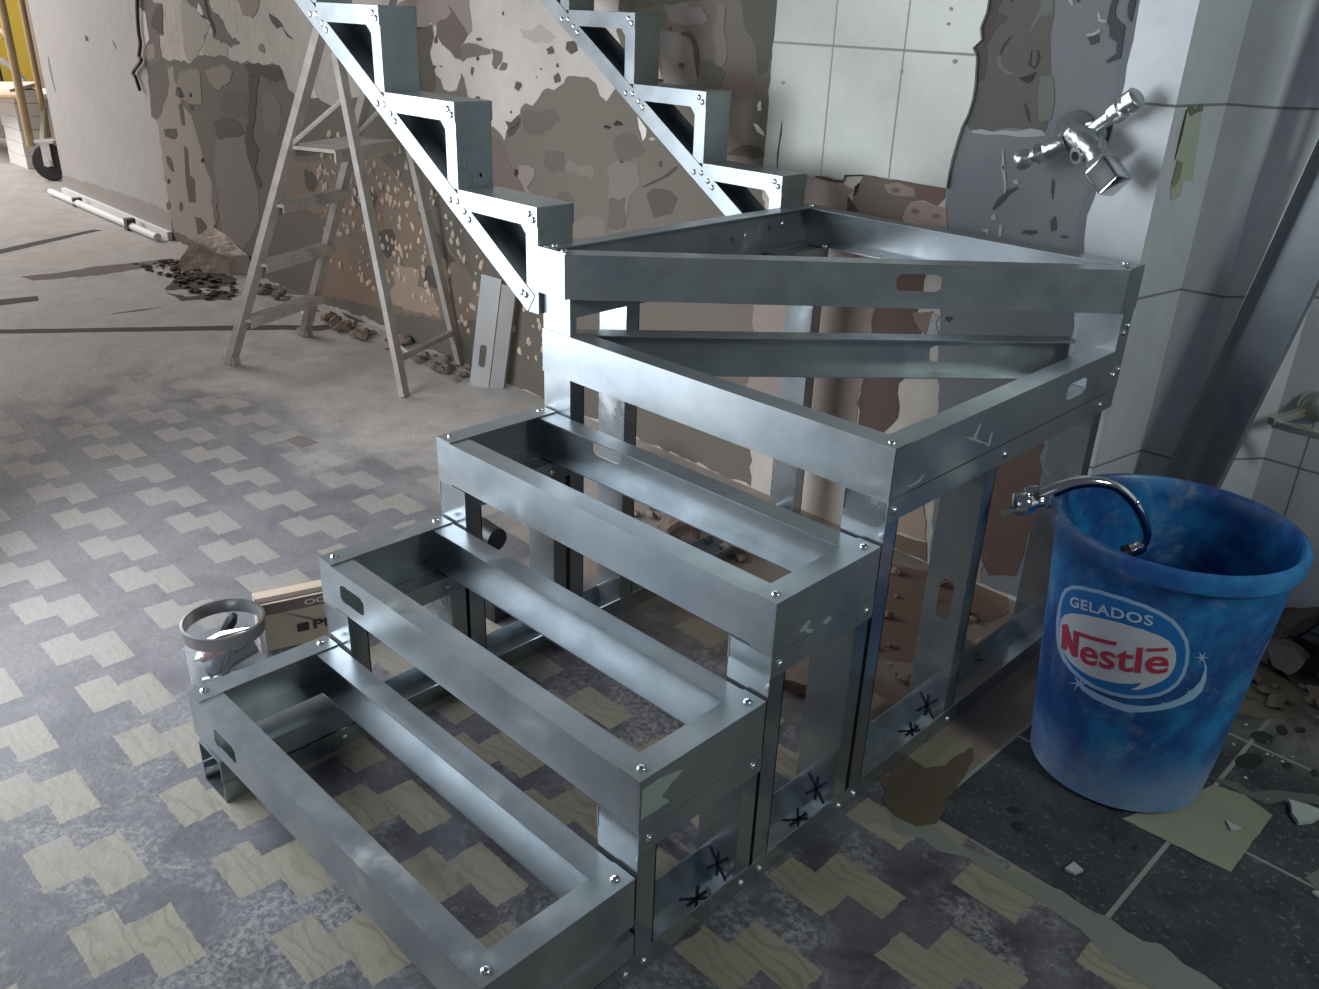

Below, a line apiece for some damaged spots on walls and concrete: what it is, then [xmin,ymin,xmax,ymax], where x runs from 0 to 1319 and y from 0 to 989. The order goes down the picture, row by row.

flaking render [618,0,772,166]
peeling [965,0,1055,132]
spalling [1088,0,1136,63]
flaking render [416,24,725,240]
flaking render [141,0,506,367]
flaking render [506,298,545,399]
flaking render [577,312,600,329]
flaking render [584,386,599,419]
flaking render [639,302,787,332]
peeling [715,376,780,398]
peeling [819,306,952,334]
flaking render [636,407,752,487]